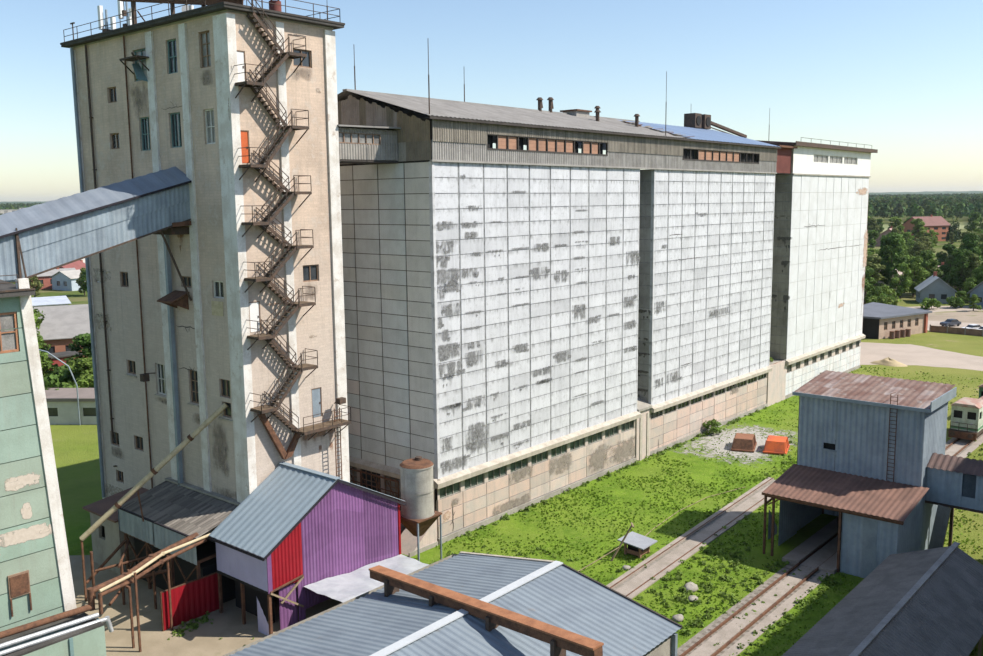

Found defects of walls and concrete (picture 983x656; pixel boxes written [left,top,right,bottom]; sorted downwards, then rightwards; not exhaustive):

leakage [589,436,636,470]
peeling [5,472,40,491]
peeling [0,502,53,547]